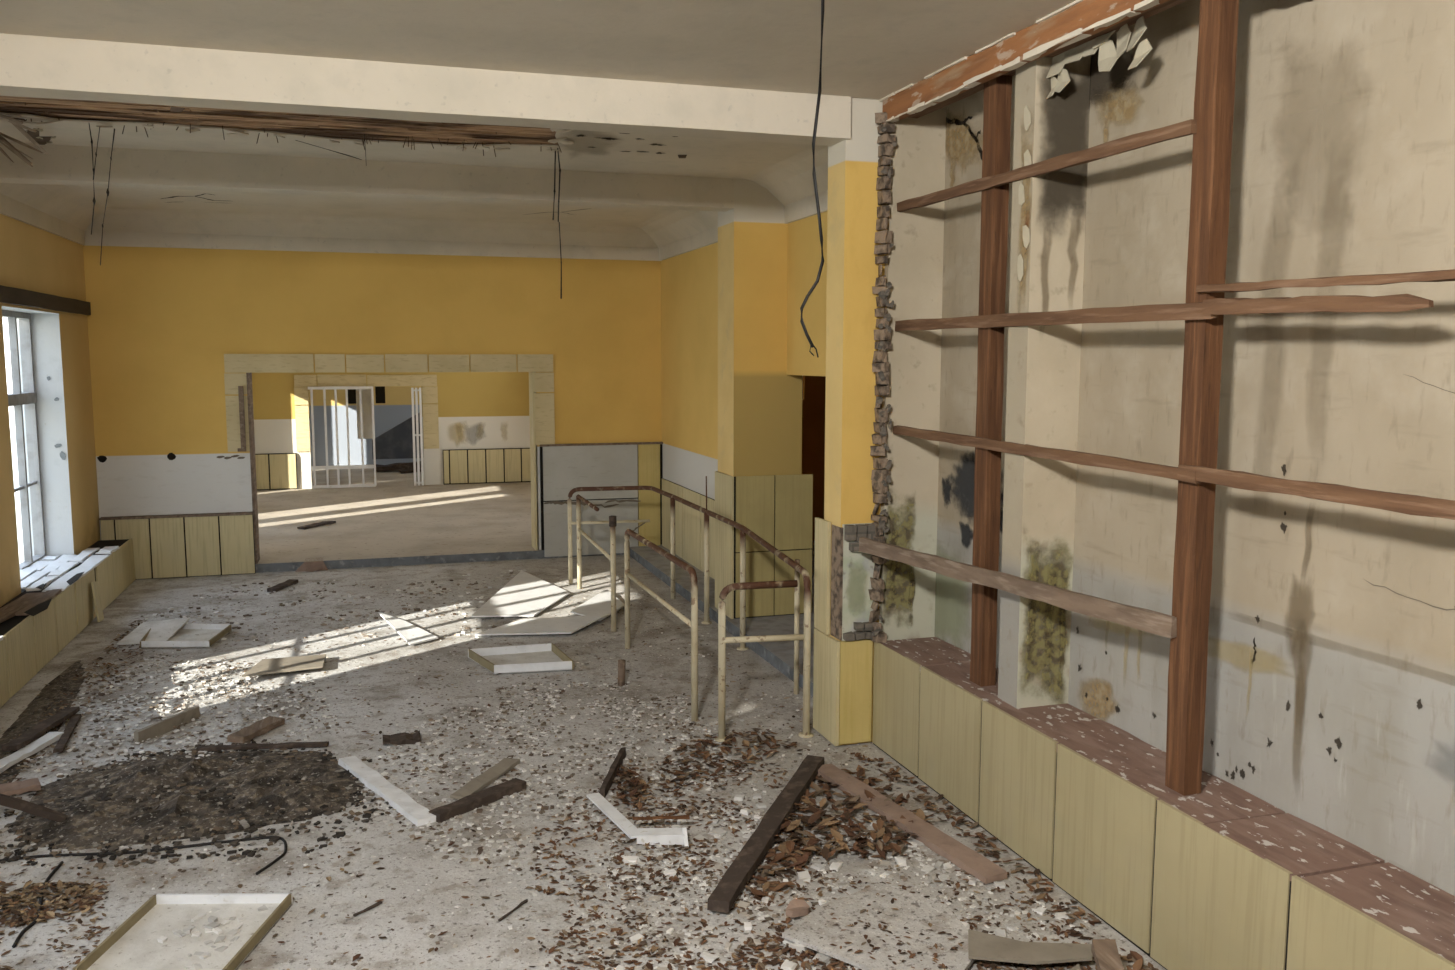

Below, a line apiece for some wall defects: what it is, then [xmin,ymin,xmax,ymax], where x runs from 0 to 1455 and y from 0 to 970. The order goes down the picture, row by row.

flaking render [0,96,574,167]
spalling [830,112,897,643]
damp [883,499,915,620]
damp [1023,547,1070,703]